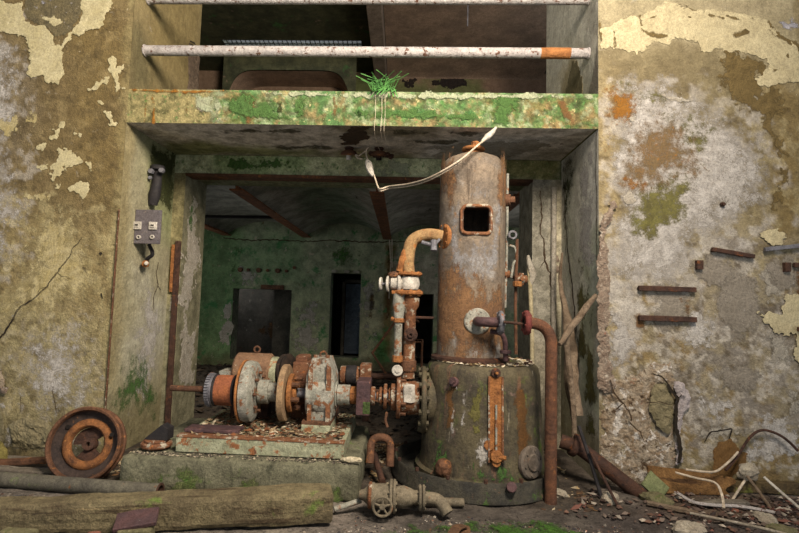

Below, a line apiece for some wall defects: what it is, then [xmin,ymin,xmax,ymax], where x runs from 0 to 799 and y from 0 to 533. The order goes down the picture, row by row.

damp [0,44,19,122]
peeling [0,0,113,85]
peeling [87,56,125,92]
damp [193,93,222,121]
damp [394,129,478,145]
corrosion [604,86,636,125]
damp [609,75,768,280]
peeling [599,1,799,211]
crack [0,238,86,338]
crack [539,179,579,368]
flaking render [596,191,677,486]
peeling [757,294,799,362]